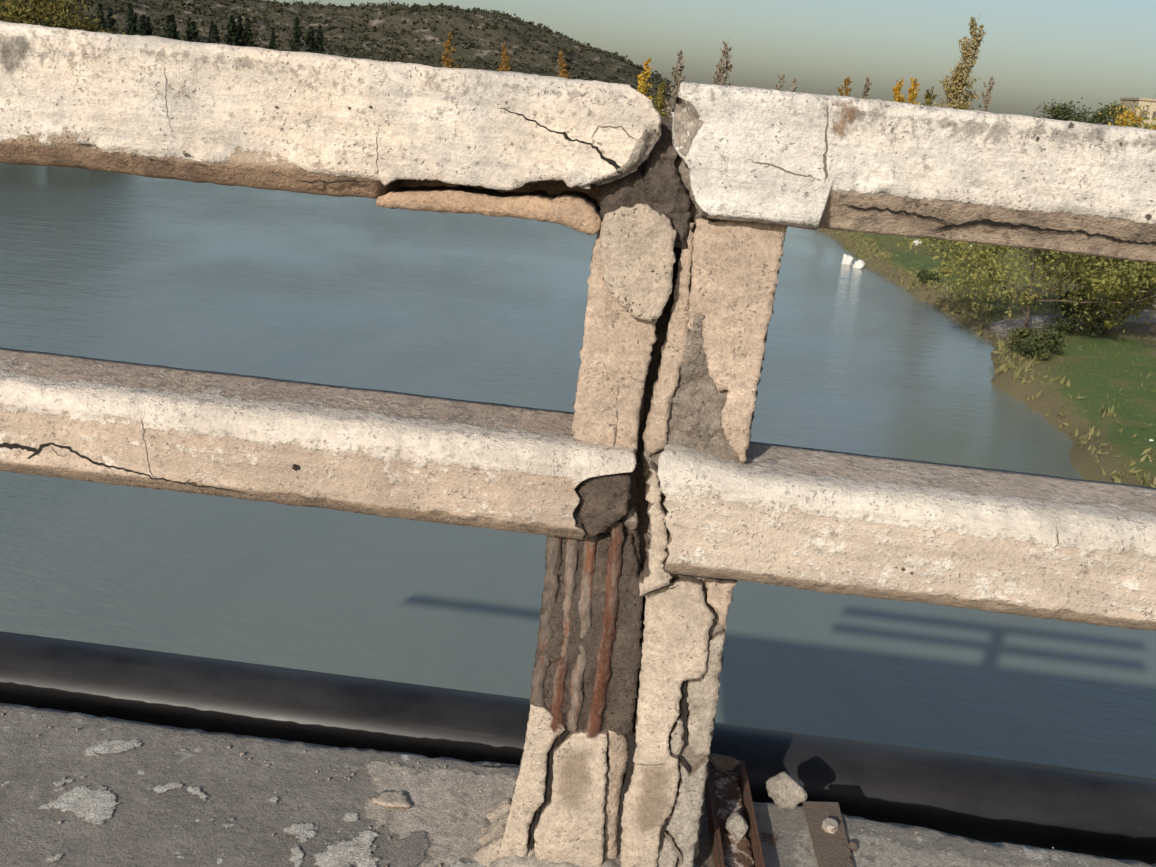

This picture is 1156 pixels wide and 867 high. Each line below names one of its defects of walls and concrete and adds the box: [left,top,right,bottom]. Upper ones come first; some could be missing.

crack [499,108,638,176]
spalling [376,100,704,322]
crack [844,204,1156,245]
spalling [662,314,747,464]
crack [0,406,244,493]
spalling [528,472,643,736]
rust [551,657,565,732]
rust [587,607,613,738]
peeling [37,776,118,826]
peeling [284,760,518,867]
crack [616,681,691,852]
rust [711,769,778,867]